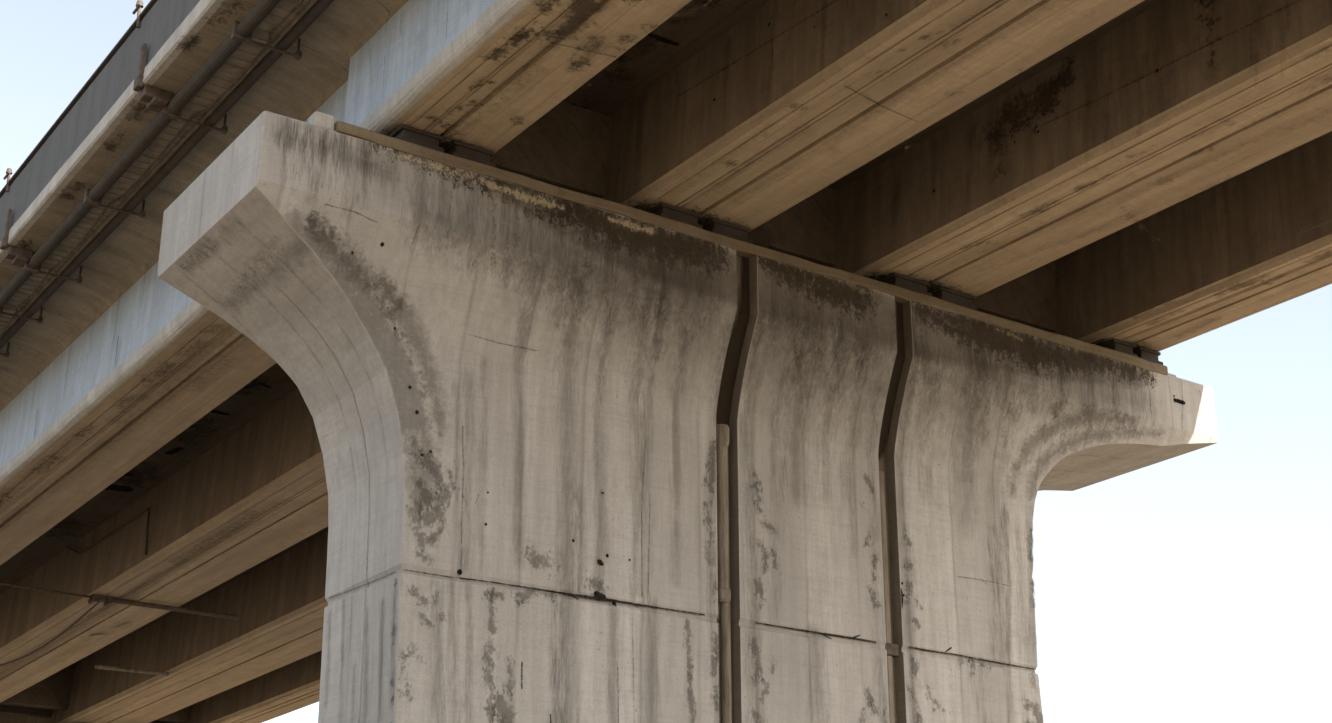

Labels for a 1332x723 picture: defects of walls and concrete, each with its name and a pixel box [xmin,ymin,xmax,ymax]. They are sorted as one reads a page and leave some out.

damp [360,130,748,290]